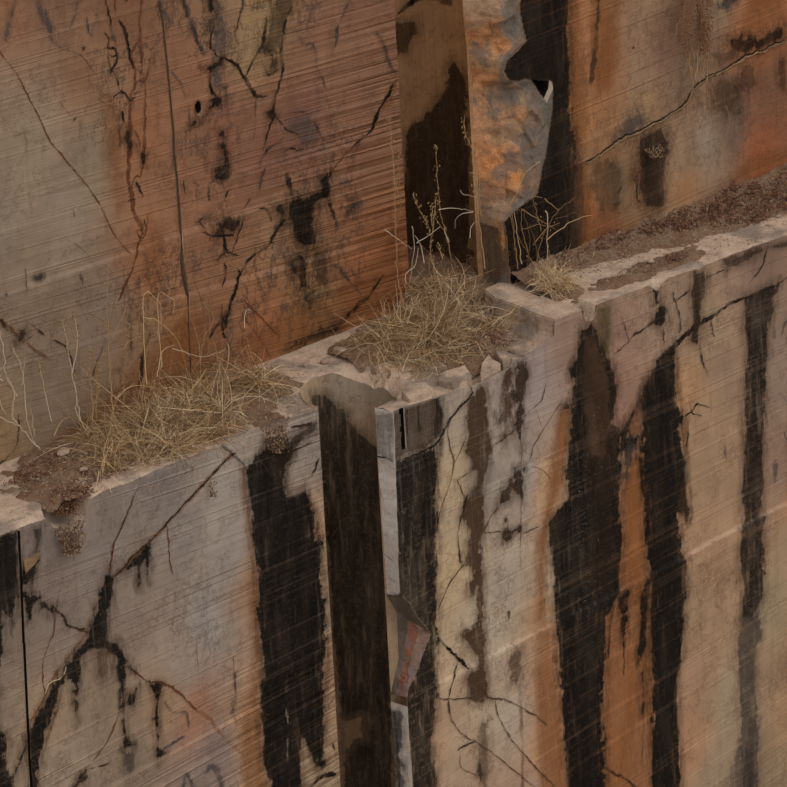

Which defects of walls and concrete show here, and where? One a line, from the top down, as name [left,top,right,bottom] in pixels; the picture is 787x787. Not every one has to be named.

crack [158,0,192,388]
crack [209,218,286,356]
damp [260,166,336,293]
spalling [462,0,553,250]
damp [504,0,584,284]
crack [585,40,786,165]
damp [0,573,140,787]
crack [109,451,240,577]
damp [245,395,443,787]
crack [440,645,555,787]
damp [460,271,707,787]
damp [738,283,786,787]